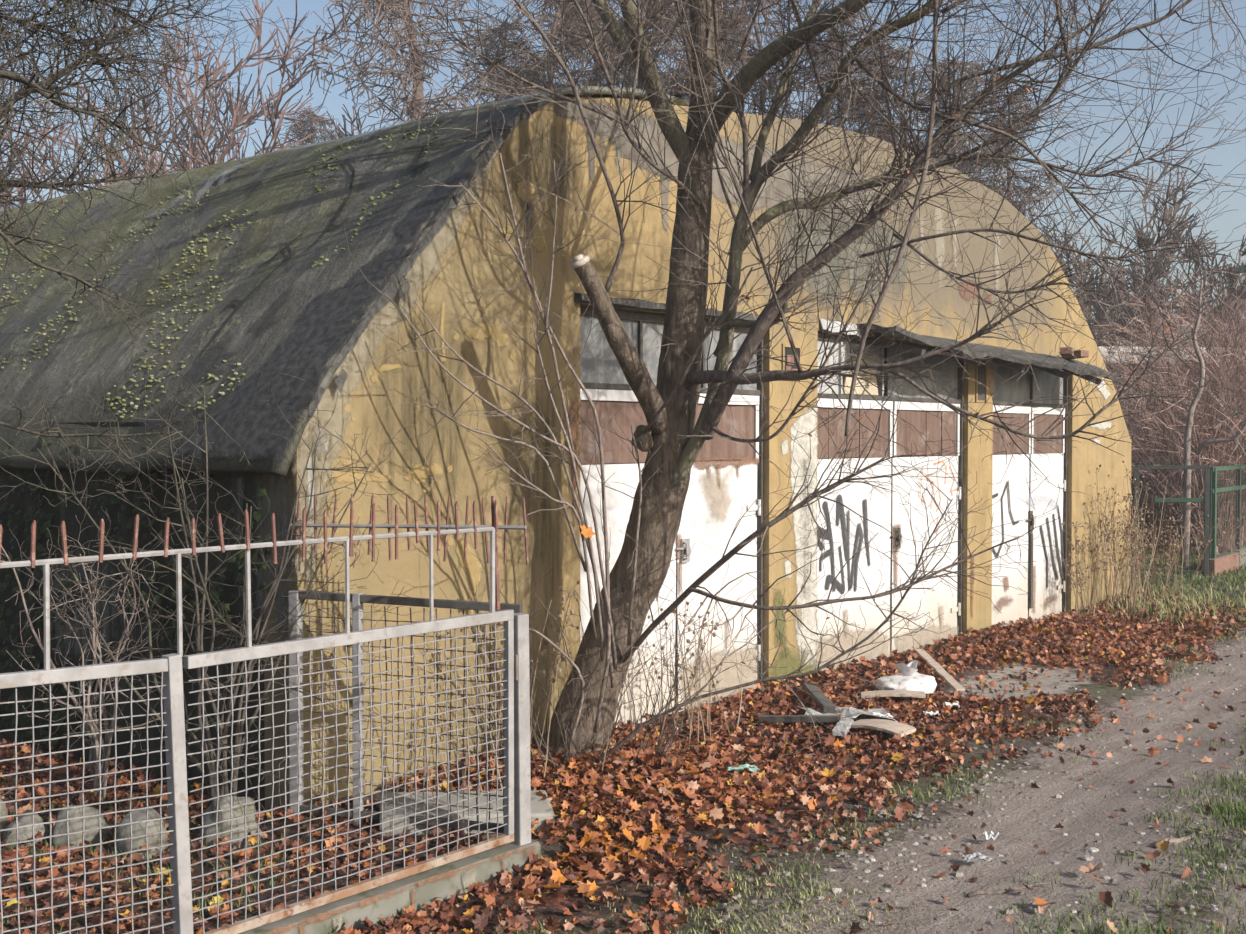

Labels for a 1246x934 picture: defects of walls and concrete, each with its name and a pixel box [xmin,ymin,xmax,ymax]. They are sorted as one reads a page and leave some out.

peeling [140,336,237,429]
peeling [251,287,294,334]
spalling [295,139,503,580]
peeling [440,302,516,361]